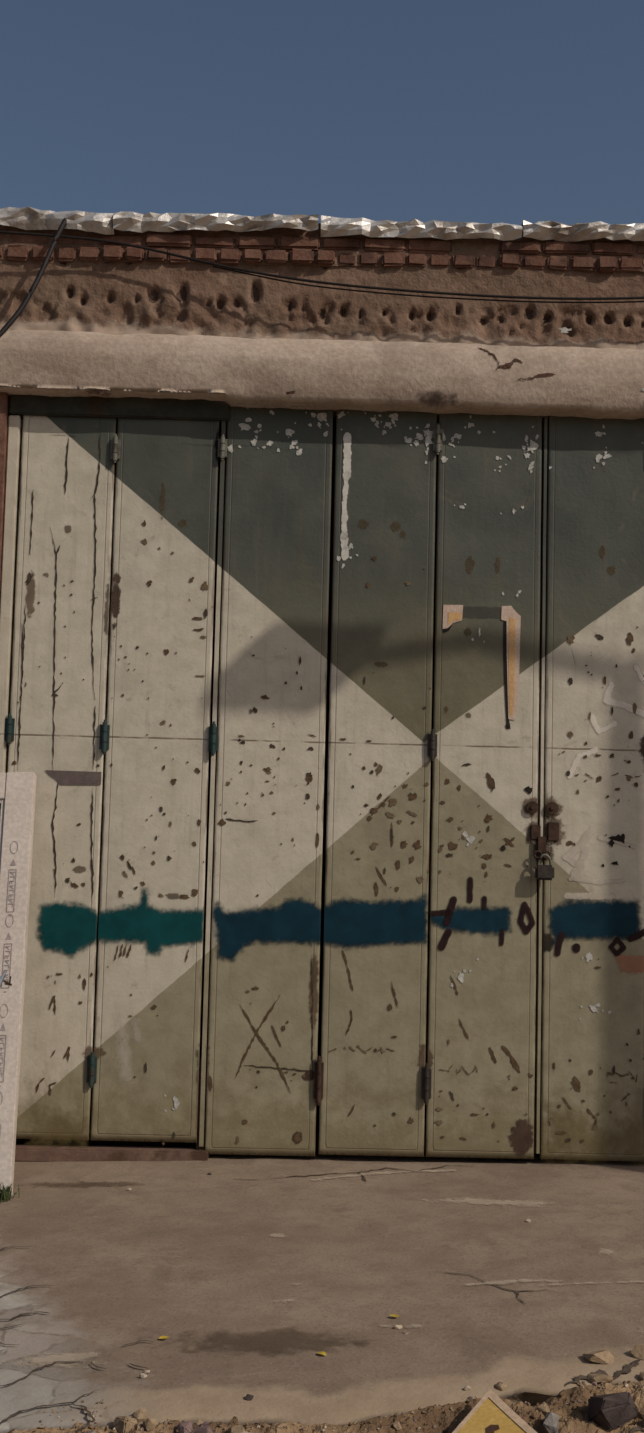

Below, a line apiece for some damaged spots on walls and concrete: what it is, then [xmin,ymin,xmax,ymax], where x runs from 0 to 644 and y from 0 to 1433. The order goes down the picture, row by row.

crack [479,348,553,380]
crack [0,1285,157,1433]